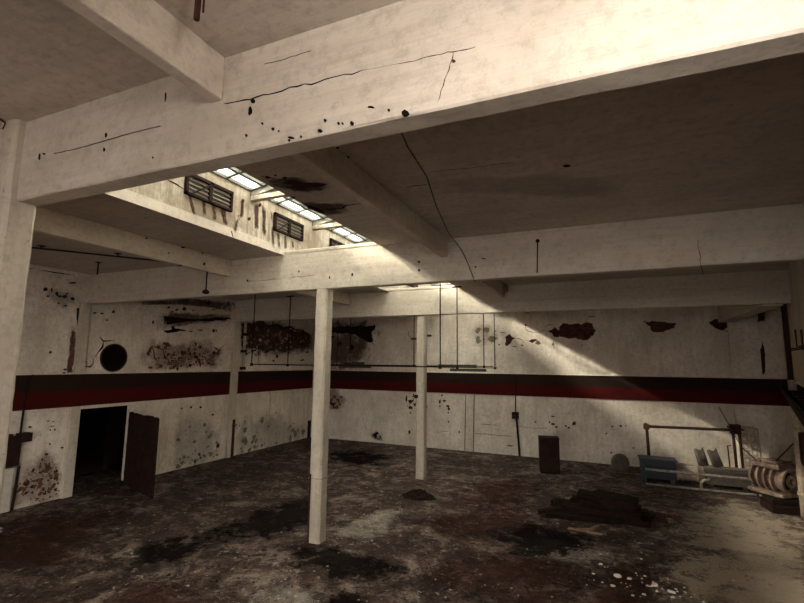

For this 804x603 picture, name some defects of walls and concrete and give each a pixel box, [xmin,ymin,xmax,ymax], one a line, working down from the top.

crack [224,47,474,104]
corrosion [62,308,79,373]
peeling [142,313,230,370]
spalling [240,321,315,366]
spalling [331,320,379,369]
spalling [475,316,596,347]
spalling [644,321,677,332]
spalling [709,319,728,332]